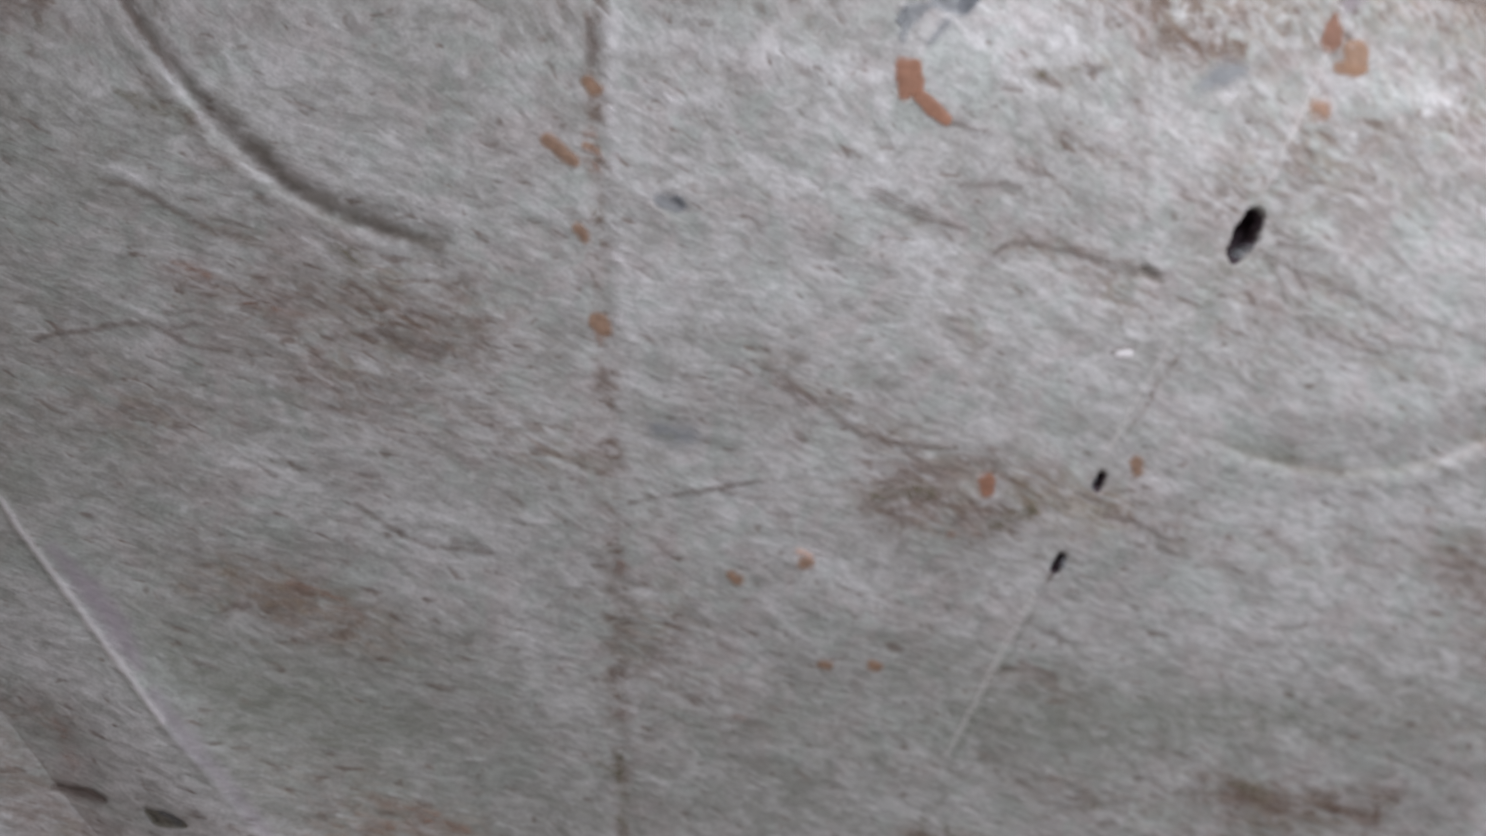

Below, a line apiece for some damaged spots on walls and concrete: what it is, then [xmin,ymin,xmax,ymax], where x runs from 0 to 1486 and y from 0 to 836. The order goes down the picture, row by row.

rust [1322,13,1368,75]
rust [897,59,952,125]
rust [542,134,599,165]
rust [590,314,610,335]
rust [979,474,995,496]